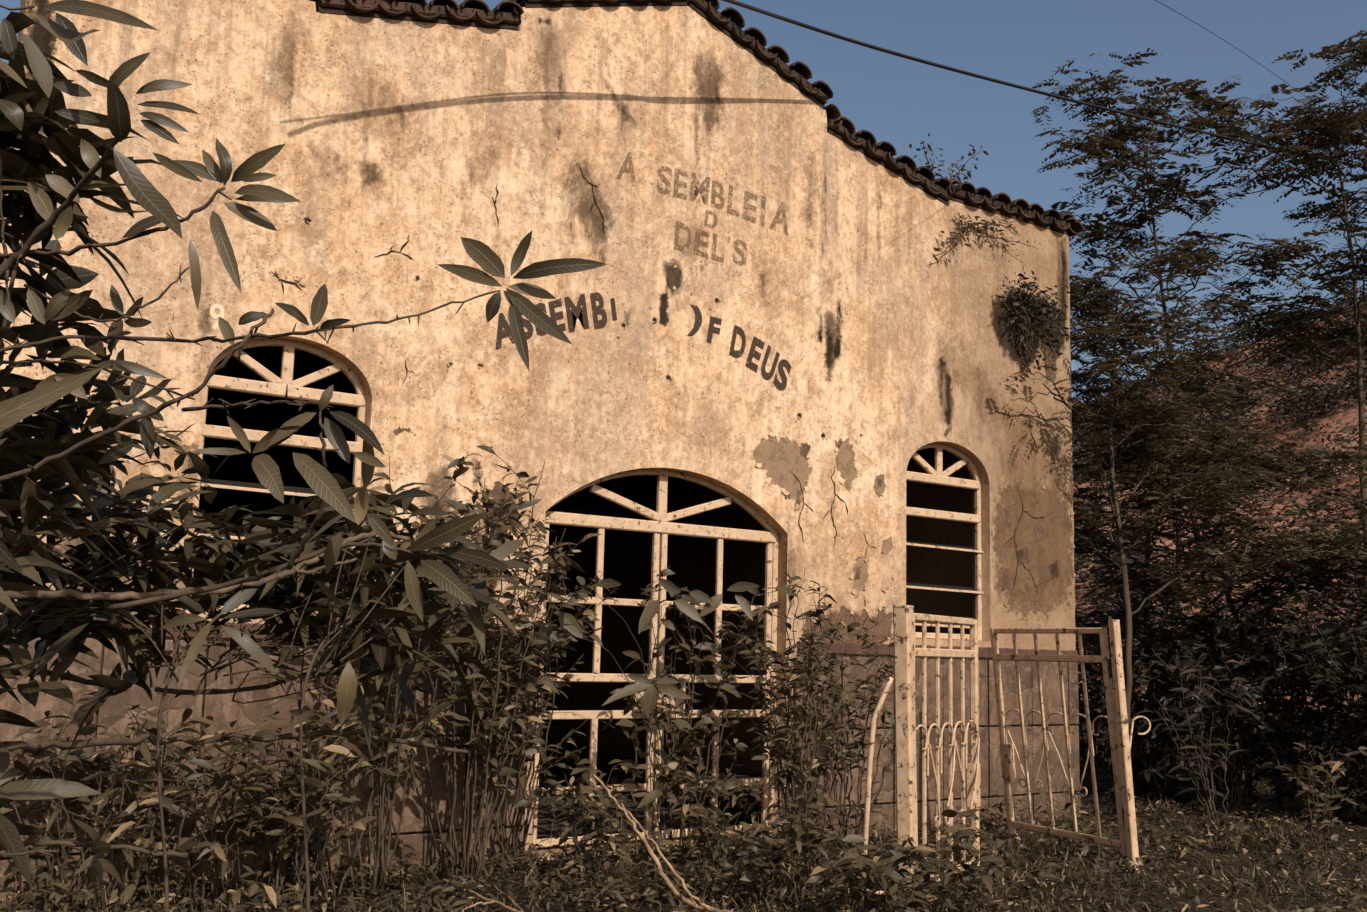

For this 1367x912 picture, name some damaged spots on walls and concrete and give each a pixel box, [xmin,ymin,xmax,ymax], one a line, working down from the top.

water stain [695,58,720,131]
crack [374,234,412,259]
water stain [572,168,613,262]
water stain [817,302,843,381]
water stain [989,241,1069,381]
water stain [939,356,953,436]
peeling [753,432,886,510]
spalling [991,479,1076,625]